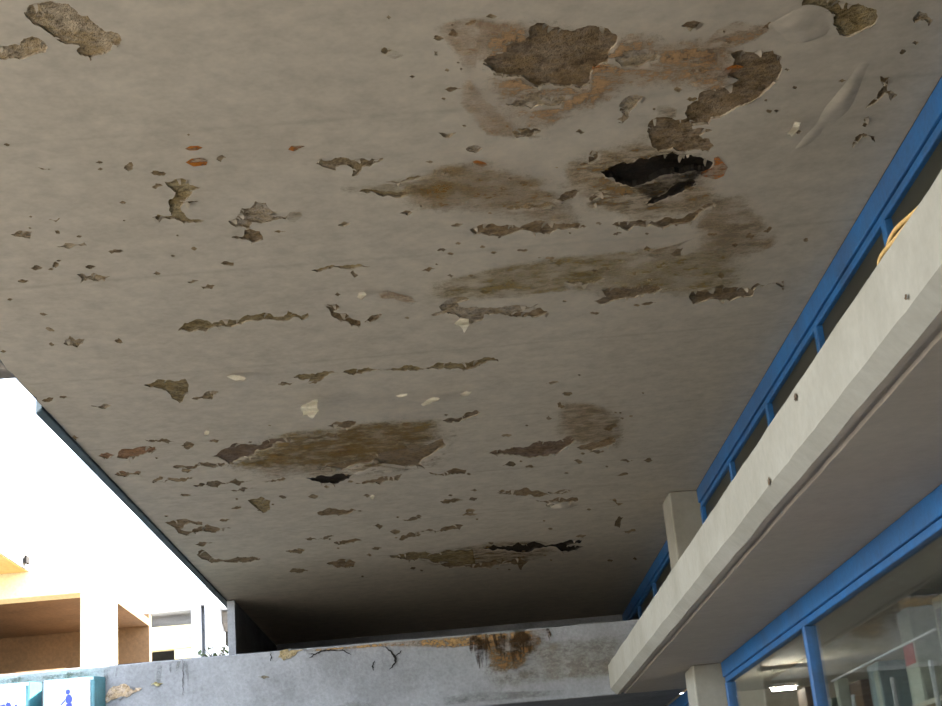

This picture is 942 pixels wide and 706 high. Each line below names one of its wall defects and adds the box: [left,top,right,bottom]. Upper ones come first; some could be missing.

peeling [0,1,121,61]
peeling [802,0,877,35]
peeling [483,23,657,108]
peeling [617,30,789,175]
water stain [408,167,570,219]
water stain [444,147,771,297]
peeling [179,311,309,334]
peeling [153,430,292,512]
water stain [237,422,434,474]
peeling [165,515,259,562]
crack [310,649,351,658]
crack [372,646,401,671]